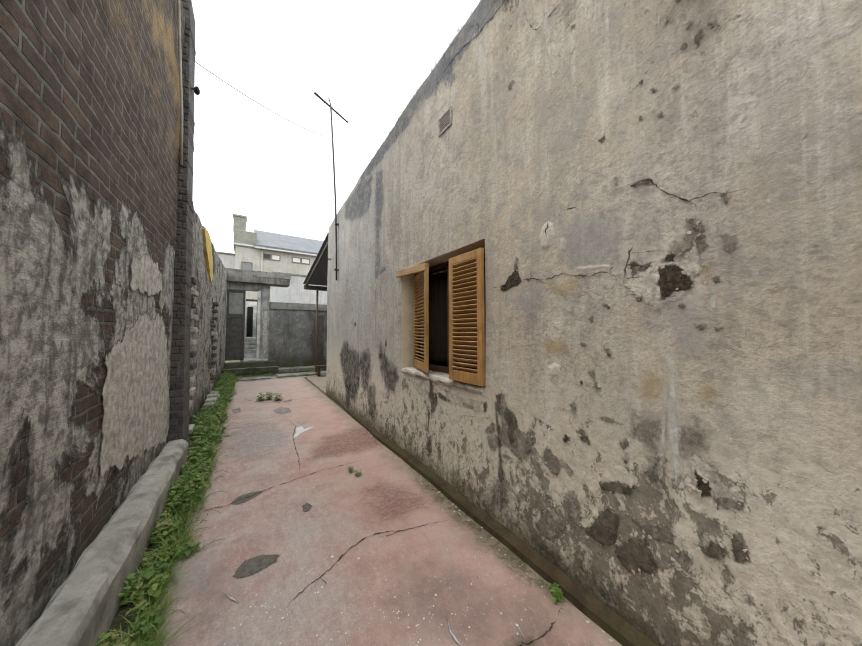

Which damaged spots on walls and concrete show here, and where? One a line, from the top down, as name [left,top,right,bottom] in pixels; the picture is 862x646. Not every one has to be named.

crack [628,178,746,210]
crack [494,247,660,300]
peeling [624,219,709,310]
water stain [340,342,398,419]
peeling [231,491,262,505]
peeling [233,555,279,579]
crack [290,521,441,603]
water stain [426,382,437,454]
water stain [485,402,507,506]
spalling [536,478,750,578]
peeling [684,453,745,510]
crack [517,610,560,646]